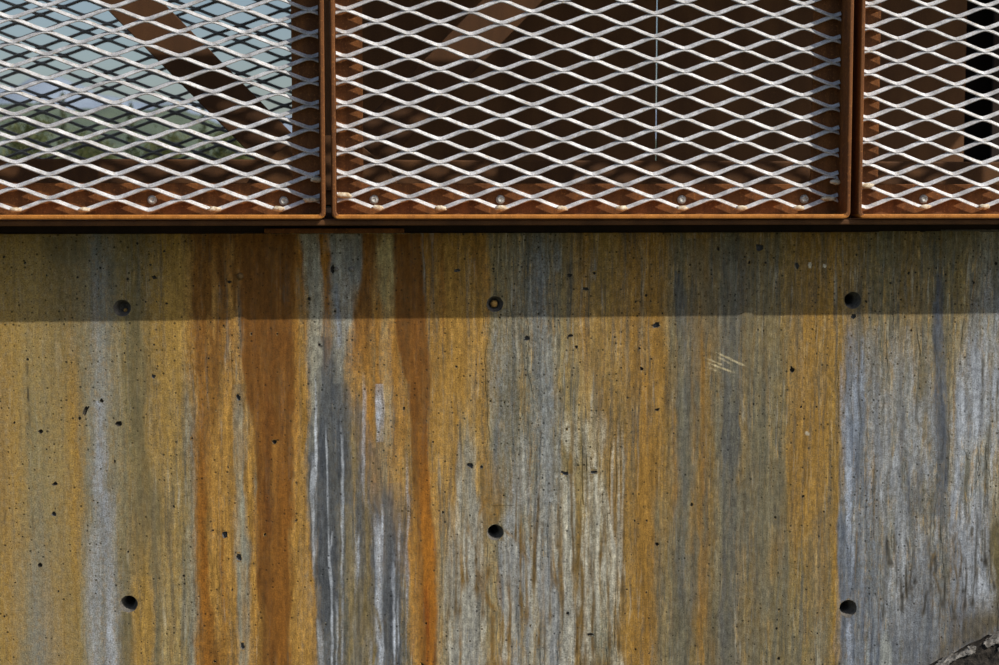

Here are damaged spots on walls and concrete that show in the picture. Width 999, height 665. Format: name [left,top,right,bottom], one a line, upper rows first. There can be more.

rust [61,346,88,665]
damp [302,234,410,665]
rust [129,234,679,665]
rust [776,235,851,665]
damp [644,231,999,665]